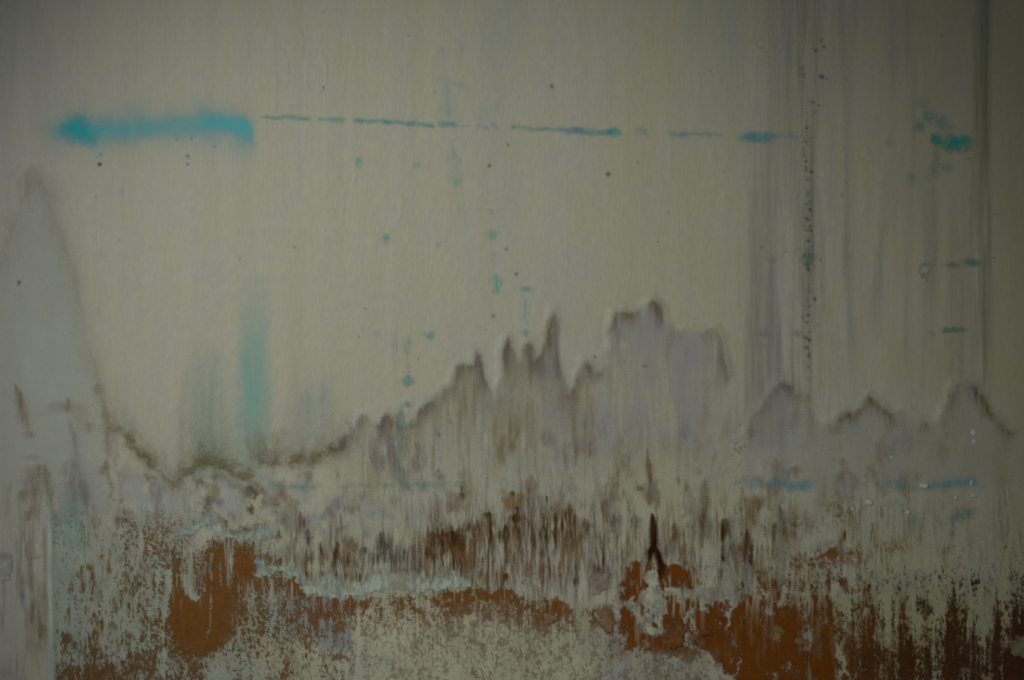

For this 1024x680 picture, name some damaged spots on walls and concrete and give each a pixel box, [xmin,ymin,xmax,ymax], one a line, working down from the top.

corrosion [294,538,367,582]
corrosion [365,492,604,591]
peeling [55,519,1024,680]
corrosion [647,514,664,578]